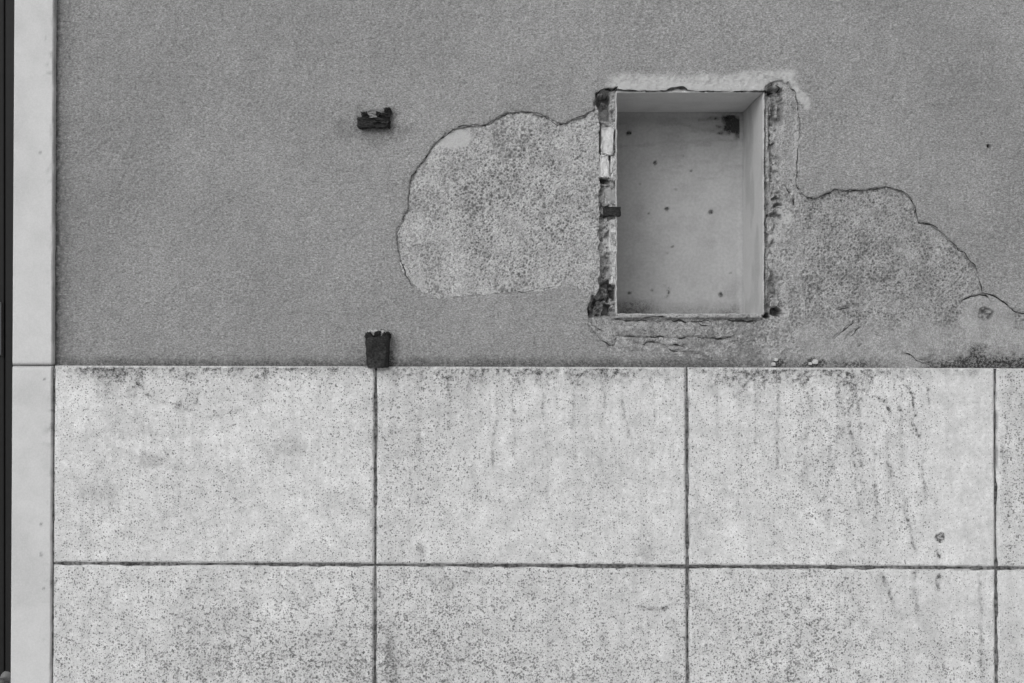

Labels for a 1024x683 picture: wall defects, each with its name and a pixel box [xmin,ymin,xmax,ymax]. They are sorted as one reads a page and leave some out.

flaking render [396,106,600,299]
flaking render [783,82,1024,368]